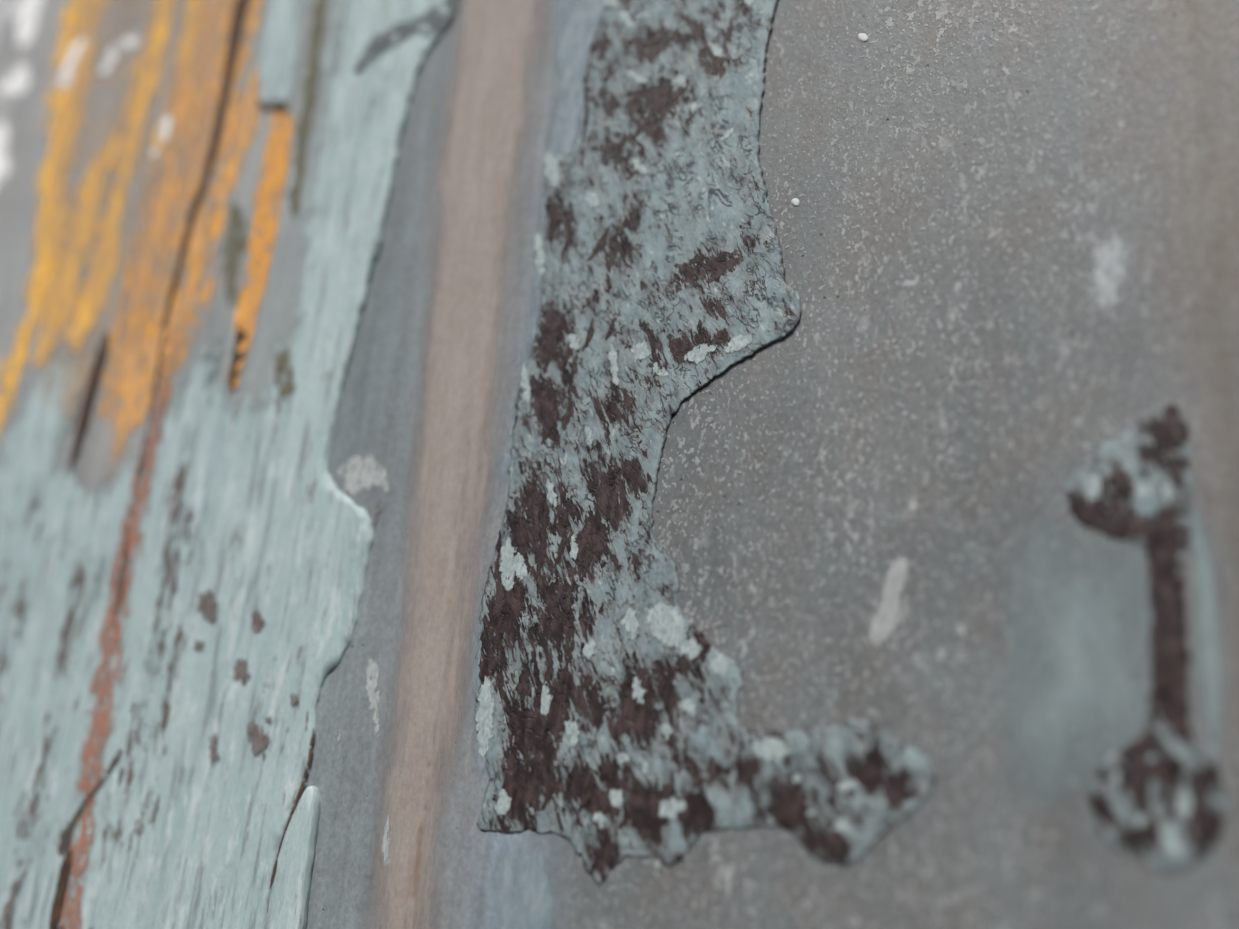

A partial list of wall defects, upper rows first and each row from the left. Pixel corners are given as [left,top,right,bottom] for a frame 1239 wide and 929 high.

corrosion [0,0,294,929]
peeling [0,0,460,929]
peeling [474,0,938,885]
peeling [1065,404,1228,874]